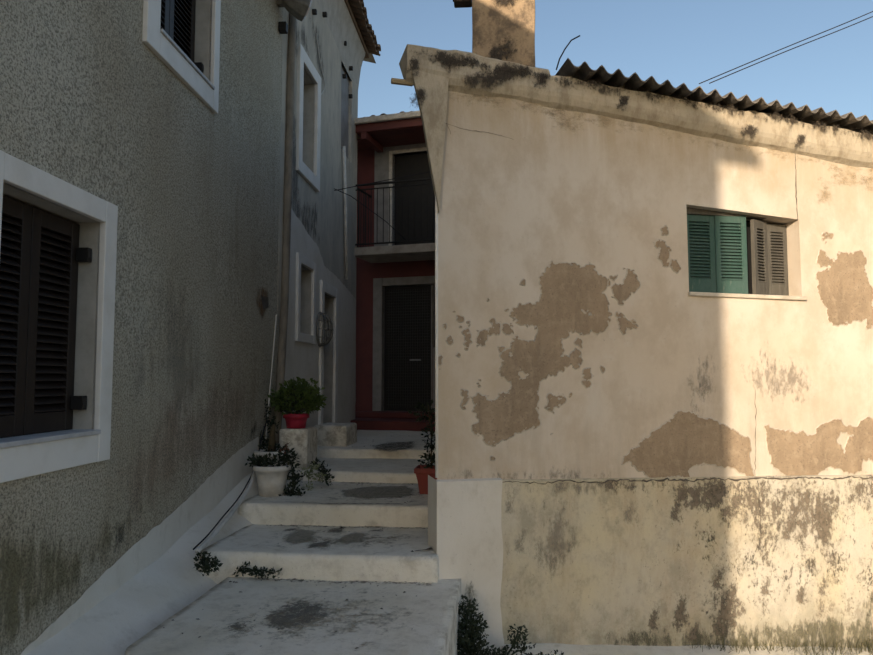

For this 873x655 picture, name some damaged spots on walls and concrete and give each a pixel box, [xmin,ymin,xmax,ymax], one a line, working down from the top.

water stain [467,38,558,87]
peeling [653,225,681,274]
peeling [815,231,873,330]
peeling [442,260,641,461]
peeling [621,410,755,478]
crack [505,393,873,551]
peeling [763,416,873,476]
water stain [605,479,873,648]